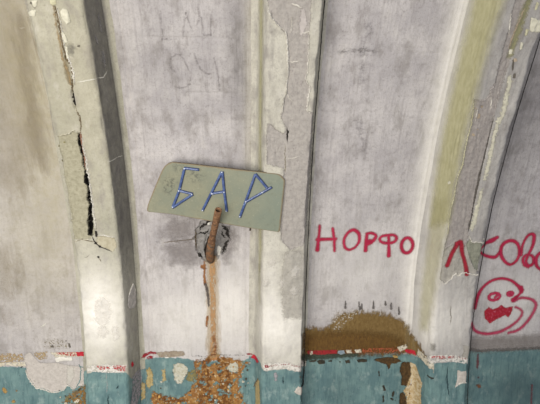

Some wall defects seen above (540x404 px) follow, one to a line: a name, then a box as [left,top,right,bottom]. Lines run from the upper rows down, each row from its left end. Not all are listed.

crack [55,6,110,261]
flaking render [266,0,314,250]
flaking render [440,0,540,285]
spalling [195,220,230,262]
peeling [20,352,84,393]
peeling [97,361,198,404]
rust [150,256,250,404]